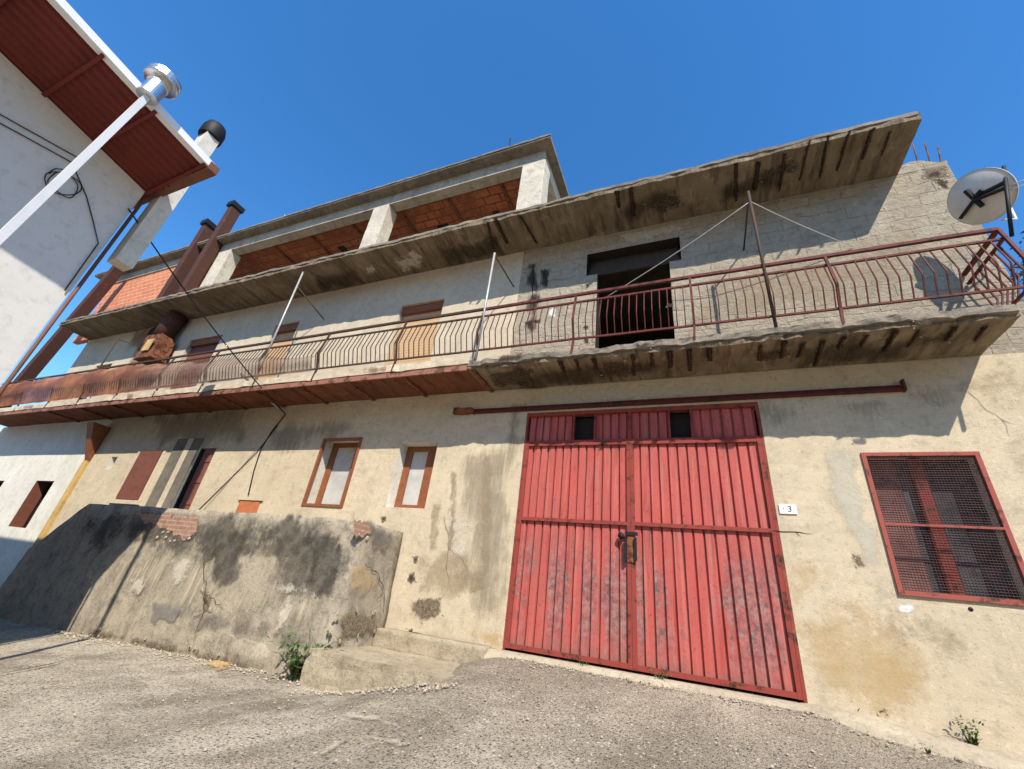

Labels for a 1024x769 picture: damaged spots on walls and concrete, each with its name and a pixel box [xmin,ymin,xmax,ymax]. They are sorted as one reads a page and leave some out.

damp [527,264,549,331]
flaking render [135,510,199,542]
flaking render [353,516,386,541]
crack [193,564,222,638]
damp [271,532,340,628]